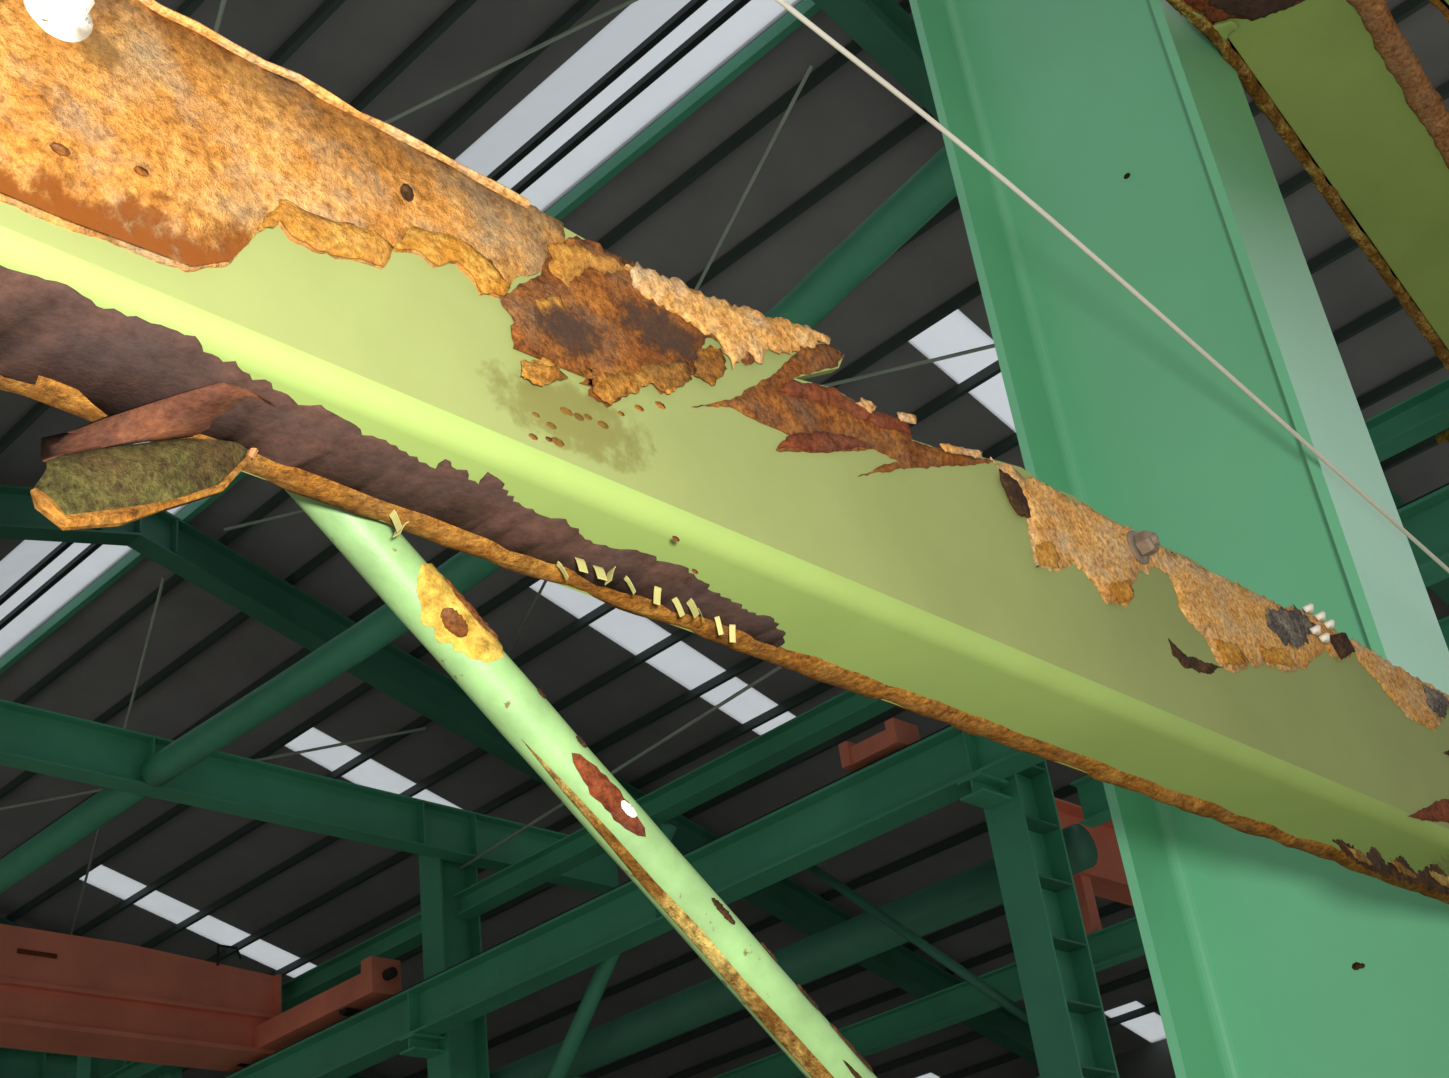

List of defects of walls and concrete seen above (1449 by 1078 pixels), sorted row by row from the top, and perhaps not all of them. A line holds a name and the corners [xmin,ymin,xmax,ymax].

peeling [0,265,786,649]
rust [0,0,1449,733]
rust [0,375,1449,904]
rust [522,740,834,1078]